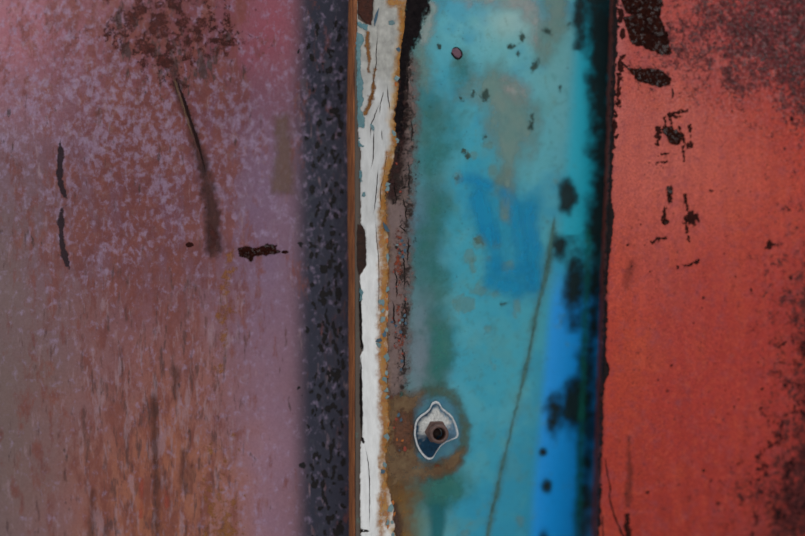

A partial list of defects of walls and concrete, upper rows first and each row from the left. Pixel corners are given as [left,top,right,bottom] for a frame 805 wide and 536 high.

spalling [617,0,672,55]
peeling [356,0,379,130]
spalling [623,63,674,98]
spalling [654,109,693,165]
rust [99,0,250,373]
spalling [661,186,673,225]
spalling [682,193,700,243]
spalling [356,224,366,274]
rust [378,0,470,536]
peeling [375,286,390,399]
crack [602,459,632,536]